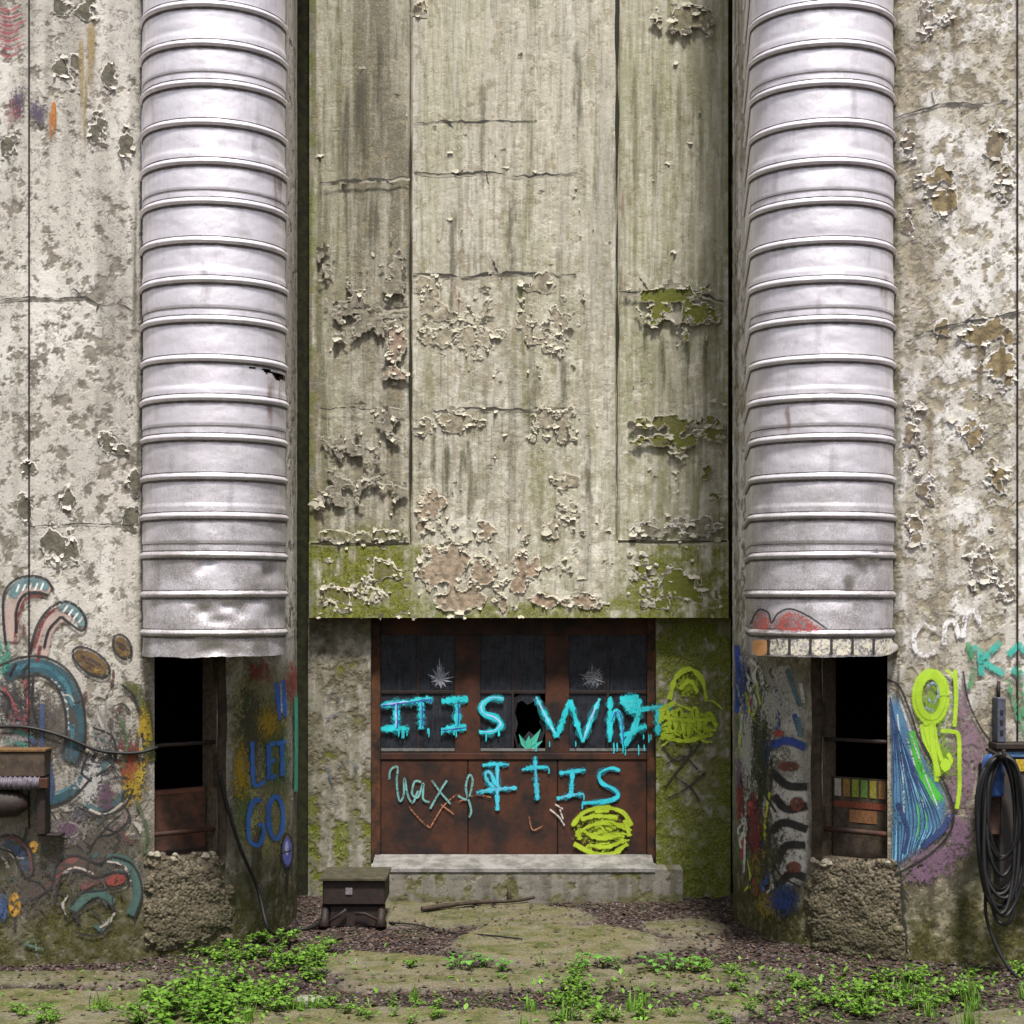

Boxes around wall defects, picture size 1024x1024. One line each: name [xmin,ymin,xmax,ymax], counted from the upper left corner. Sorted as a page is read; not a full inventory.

water stain [343,76,379,183]
crack [319,169,580,189]
crack [417,119,537,128]
peeling [900,127,958,242]
peeling [982,124,1017,207]
peeling [316,229,586,386]
crack [413,258,577,281]
peeling [626,279,724,347]
peeling [933,313,1022,450]
peeling [17,457,86,569]
peeling [308,401,615,620]
spalling [625,398,727,618]